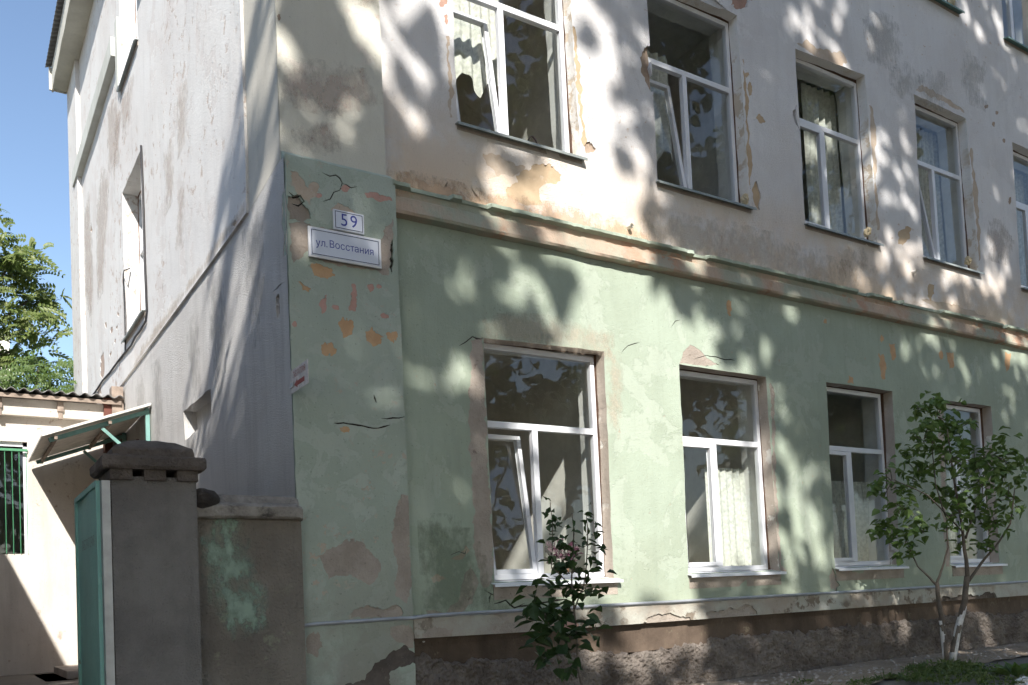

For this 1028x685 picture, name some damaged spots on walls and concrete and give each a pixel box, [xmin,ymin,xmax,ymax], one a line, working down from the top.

flaking render [700,0,747,9]
peeling [797,39,847,66]
peeling [482,153,561,206]
peeling [284,170,398,356]
peeling [679,345,719,366]
crack [335,396,403,429]
peeling [468,337,494,588]
peeling [317,538,381,585]
peeling [391,494,412,604]
peeling [345,624,453,685]